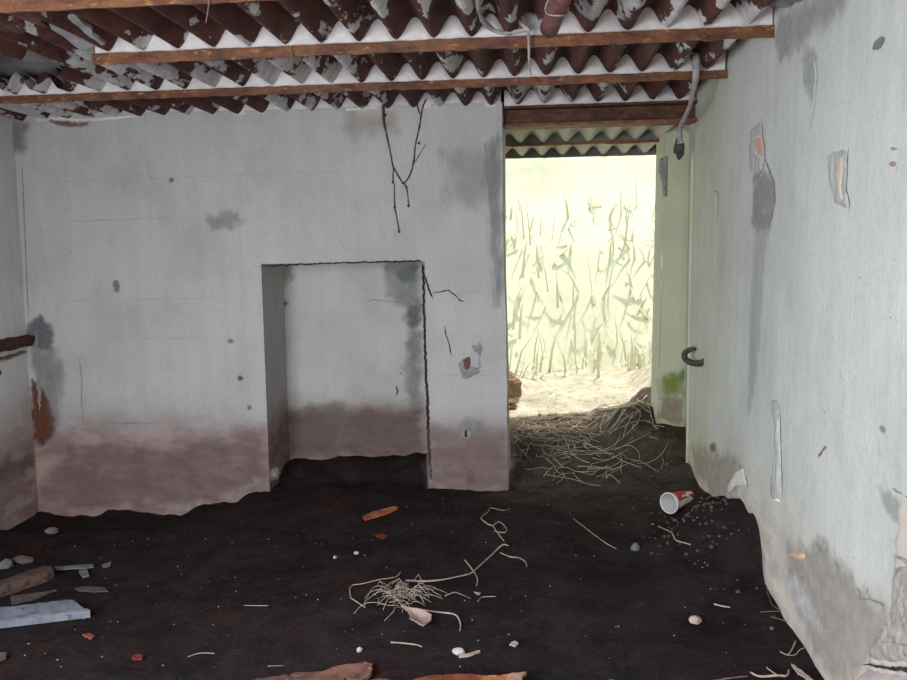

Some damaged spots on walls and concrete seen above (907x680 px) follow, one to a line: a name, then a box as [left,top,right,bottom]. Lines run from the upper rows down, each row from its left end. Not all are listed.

rust [0,12,106,49]
peeling [827,150,850,210]
leakage [288,262,420,456]
crack [258,260,463,479]
spalling [458,342,483,379]
rust [31,381,54,445]
leakage [183,479,257,511]
spalling [869,497,907,676]